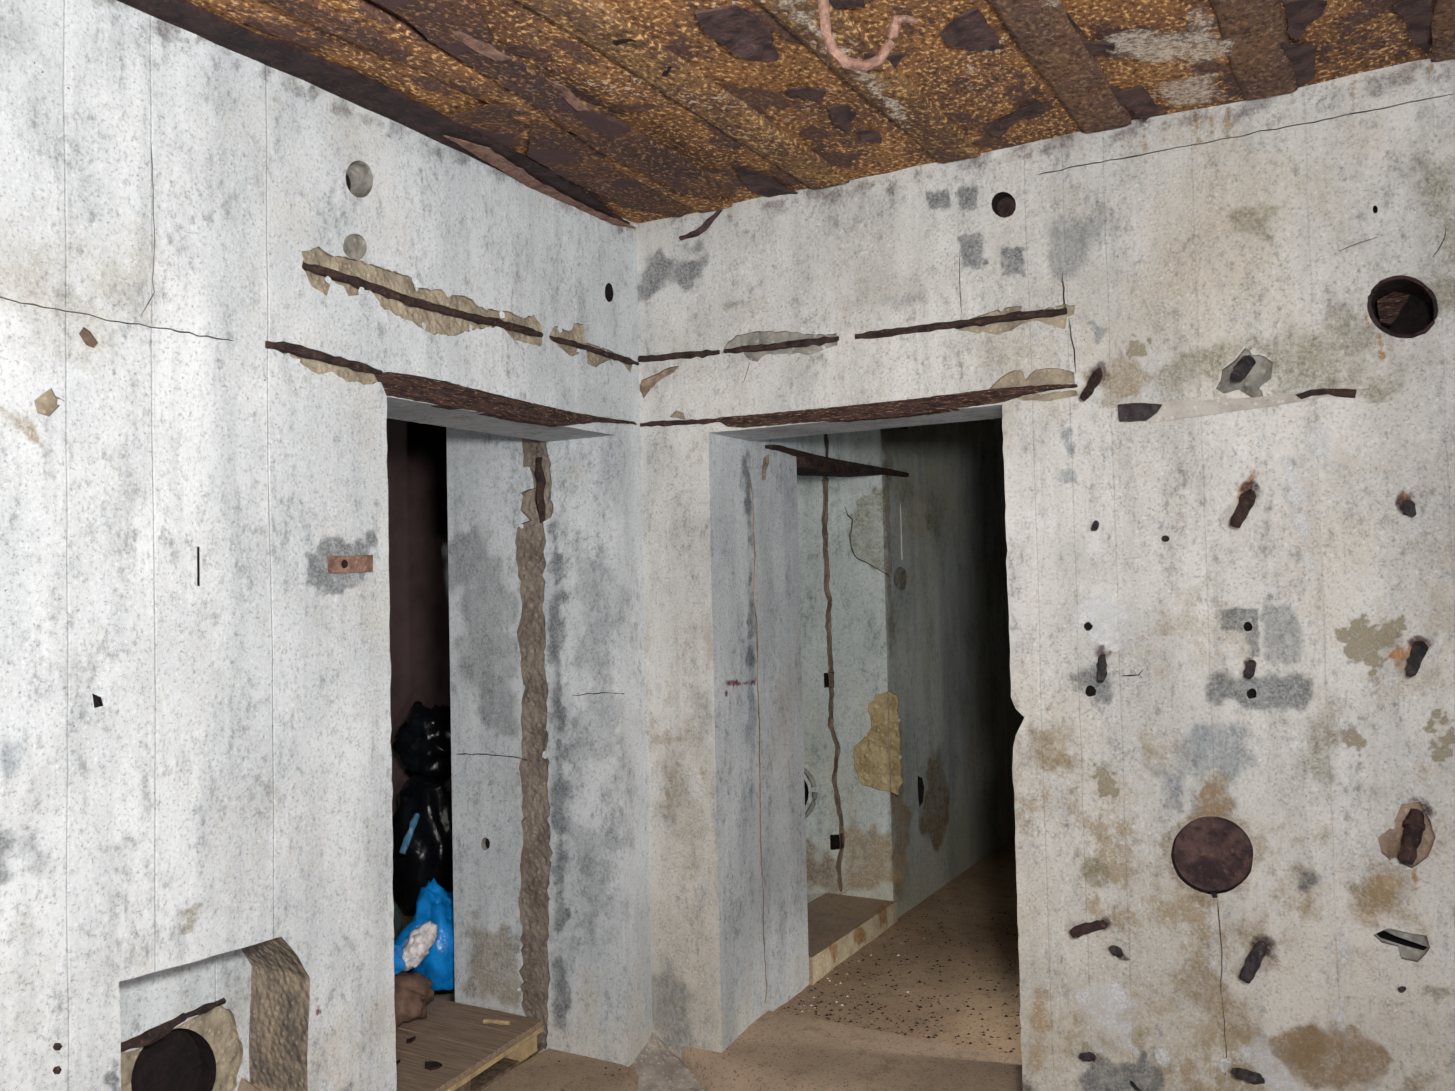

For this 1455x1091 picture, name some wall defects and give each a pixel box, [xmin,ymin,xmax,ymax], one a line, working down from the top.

rust [117,0,636,229]
crack [0,145,233,341]
spalling [301,246,679,398]
spalling [1216,347,1273,398]
rust [1390,636,1430,660]
spalling [515,438,554,1050]
spalling [853,691,904,796]
spalling [1378,797,1436,868]
spalling [1374,928,1430,962]
spalling [121,1047,144,1091]
spalling [174,1005,243,1091]